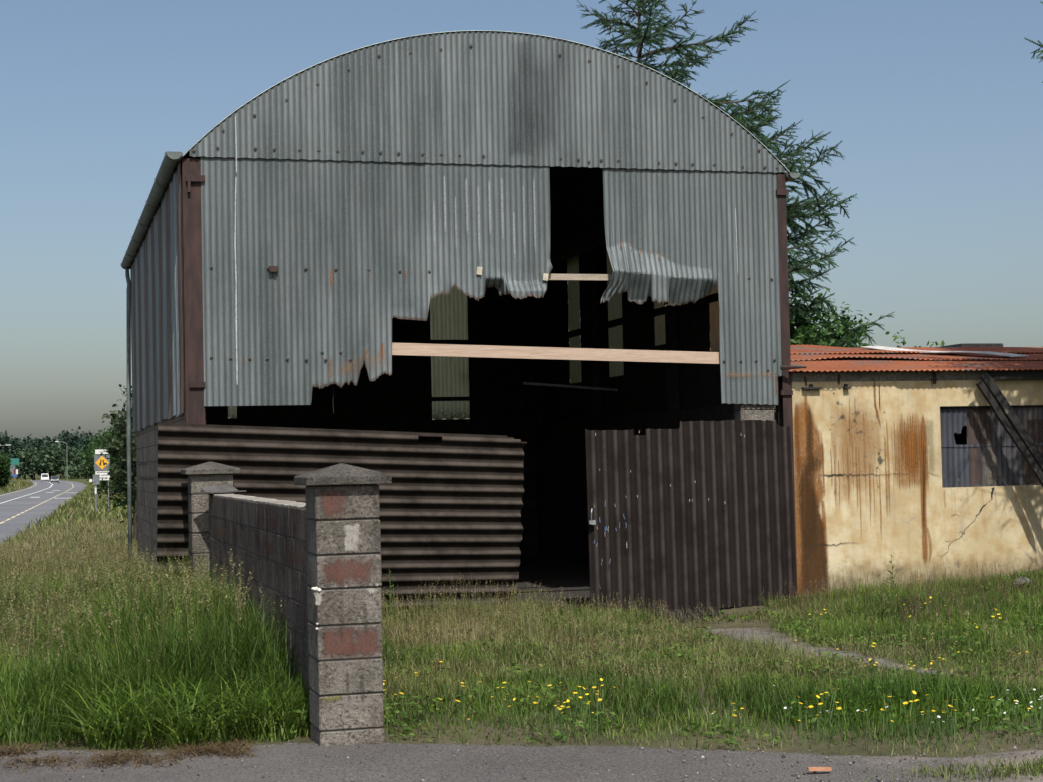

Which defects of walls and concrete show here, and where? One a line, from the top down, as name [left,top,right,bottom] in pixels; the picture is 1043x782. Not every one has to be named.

rust [794,376,827,597]
rust [894,414,932,561]
crack [939,487,994,558]